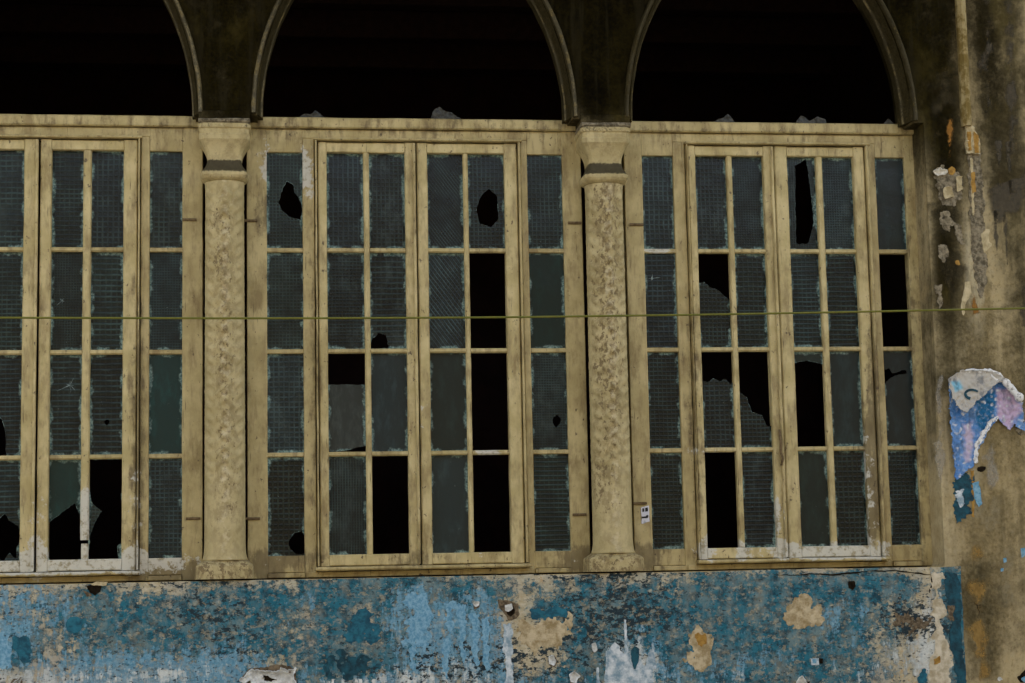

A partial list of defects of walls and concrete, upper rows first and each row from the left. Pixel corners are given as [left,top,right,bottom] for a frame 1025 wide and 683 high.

water stain [989,81,1025,264]
flaking render [933,126,992,315]
peeling [0,631,32,683]
spalling [83,581,108,597]
peeling [239,664,297,683]
peeling [322,607,381,681]
peeling [400,591,491,680]
peeling [498,600,573,667]
peeling [591,620,656,683]
peeling [783,593,825,629]
peeling [893,572,967,683]